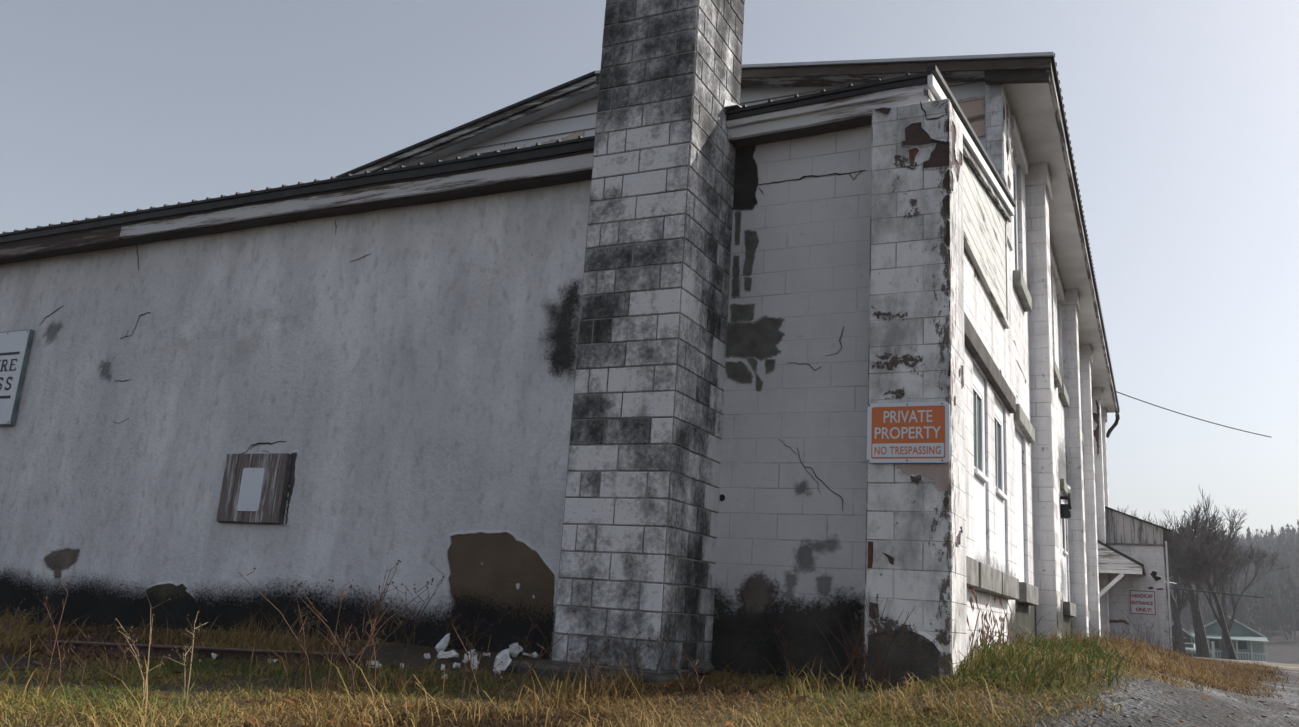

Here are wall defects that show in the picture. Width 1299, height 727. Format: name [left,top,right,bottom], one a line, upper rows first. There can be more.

spalling [874,106,893,117]
crack [759,170,866,195]
spalling [894,96,985,264]
peeling [725,145,785,392]
mould [546,283,581,381]
crack [778,439,843,511]
leakage [0,569,555,659]
flaking render [445,529,558,659]
leakage [711,539,865,682]
spalling [863,602,944,688]